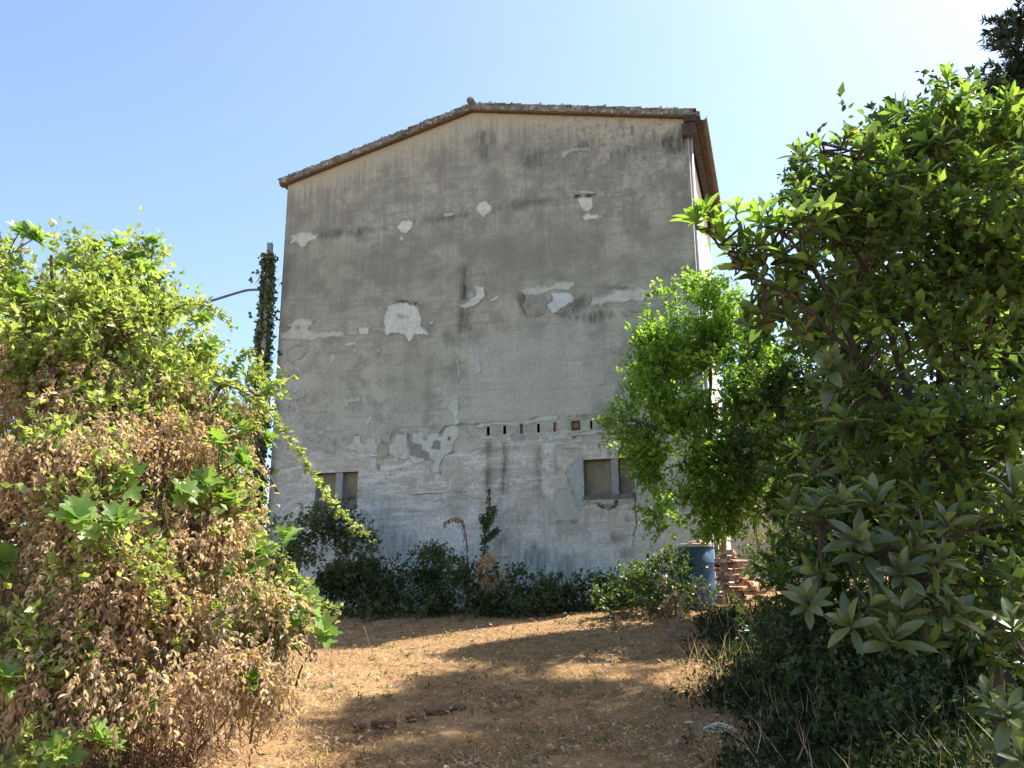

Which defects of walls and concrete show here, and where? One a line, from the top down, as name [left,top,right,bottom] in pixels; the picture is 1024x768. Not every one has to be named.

flaking render [473,200,494,220]
flaking render [572,191,604,220]
flaking render [290,231,320,247]
flaking render [395,218,415,241]
flaking render [460,285,499,309]
flaking render [521,281,656,320]
flaking render [278,300,434,365]
flaking render [303,412,606,490]